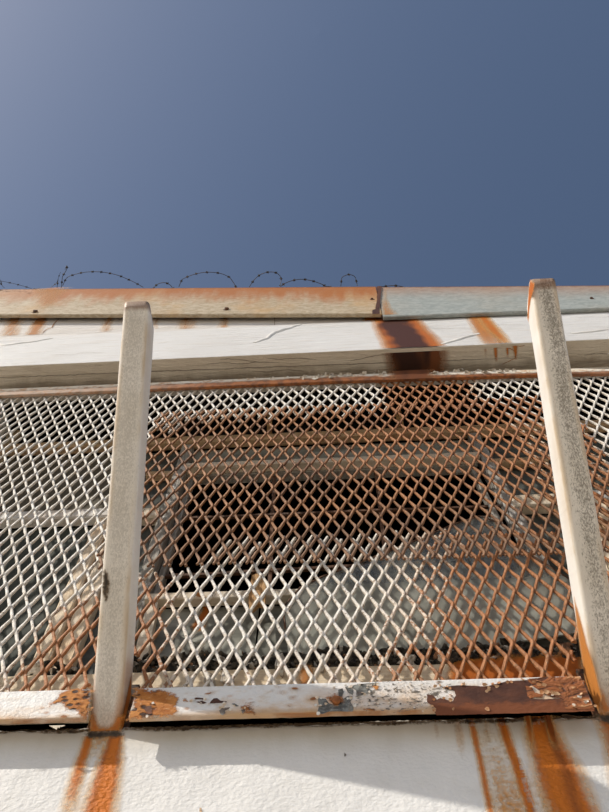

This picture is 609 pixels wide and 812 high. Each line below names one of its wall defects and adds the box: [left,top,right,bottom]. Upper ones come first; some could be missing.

corrosion [29,318,46,335]
corrosion [364,286,445,380]
corrosion [469,316,517,358]
peeling [314,683,379,715]
corrosion [427,604,609,812]
peeling [526,676,597,720]
corrosion [51,679,188,812]